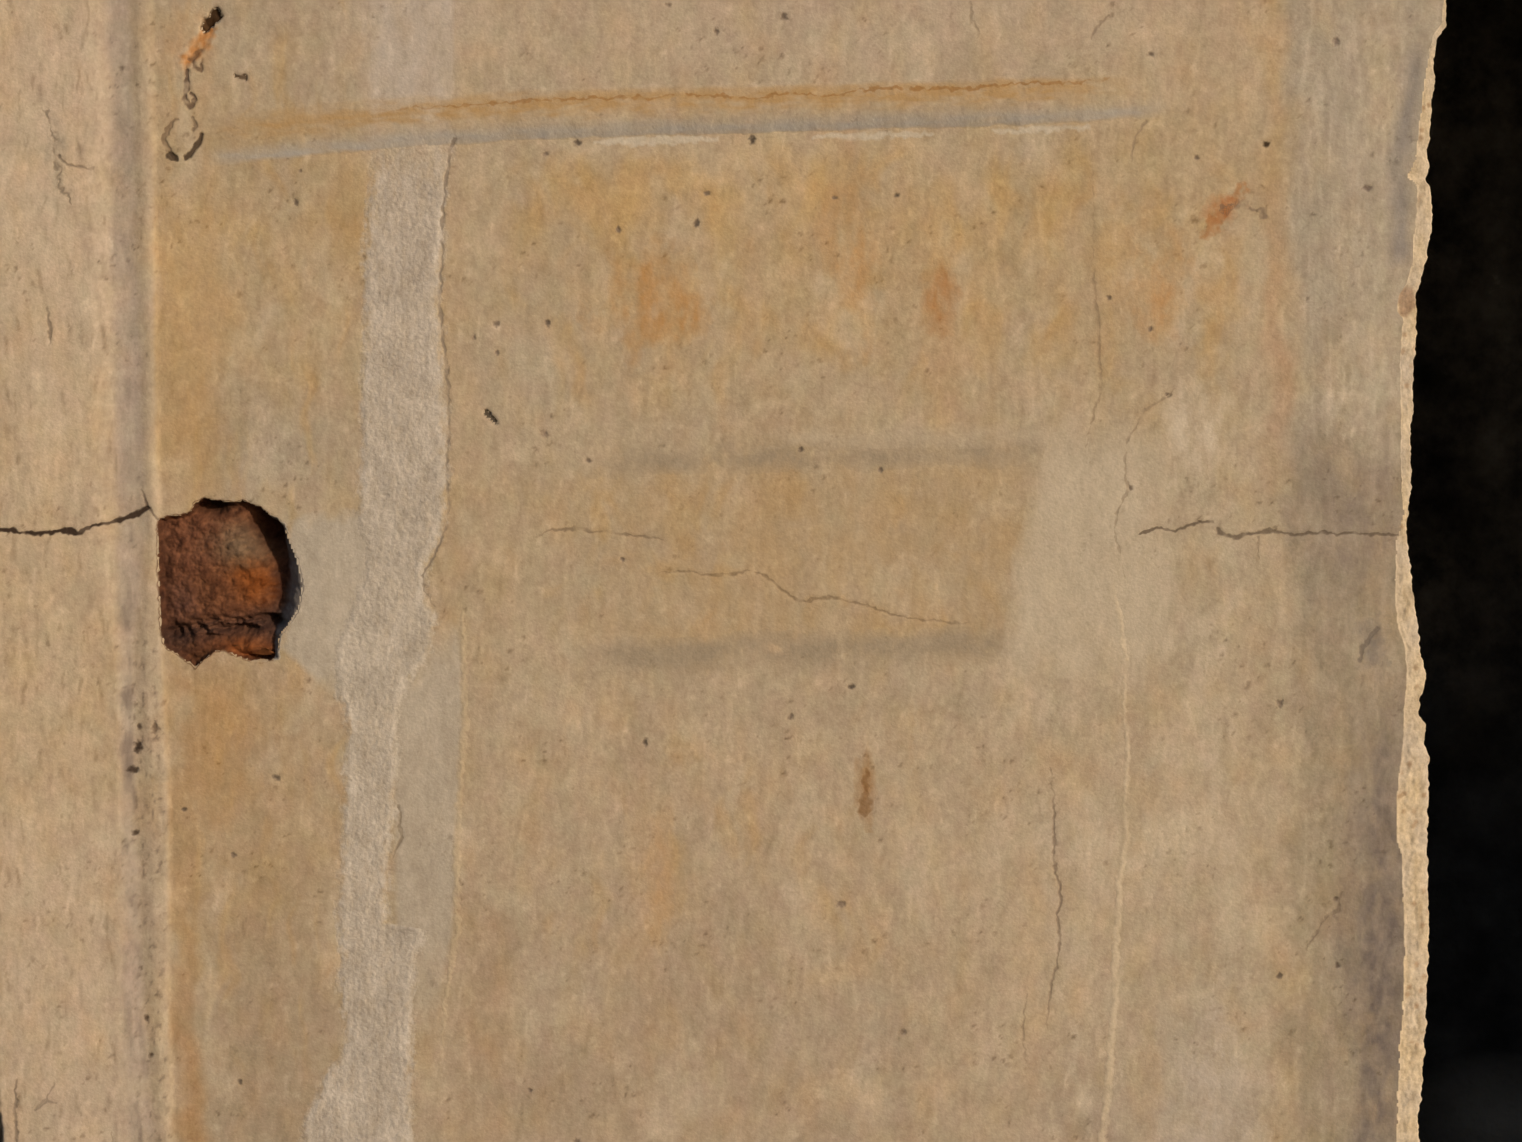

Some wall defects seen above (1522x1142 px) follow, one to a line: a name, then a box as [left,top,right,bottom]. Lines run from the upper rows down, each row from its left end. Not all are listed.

corrosion [155,0,220,106]
crack [1085,149,1103,448]
corrosion [1091,181,1269,348]
crack [0,488,160,538]
crack [1114,387,1398,579]
crack [534,525,969,625]
corrosion [853,741,878,833]